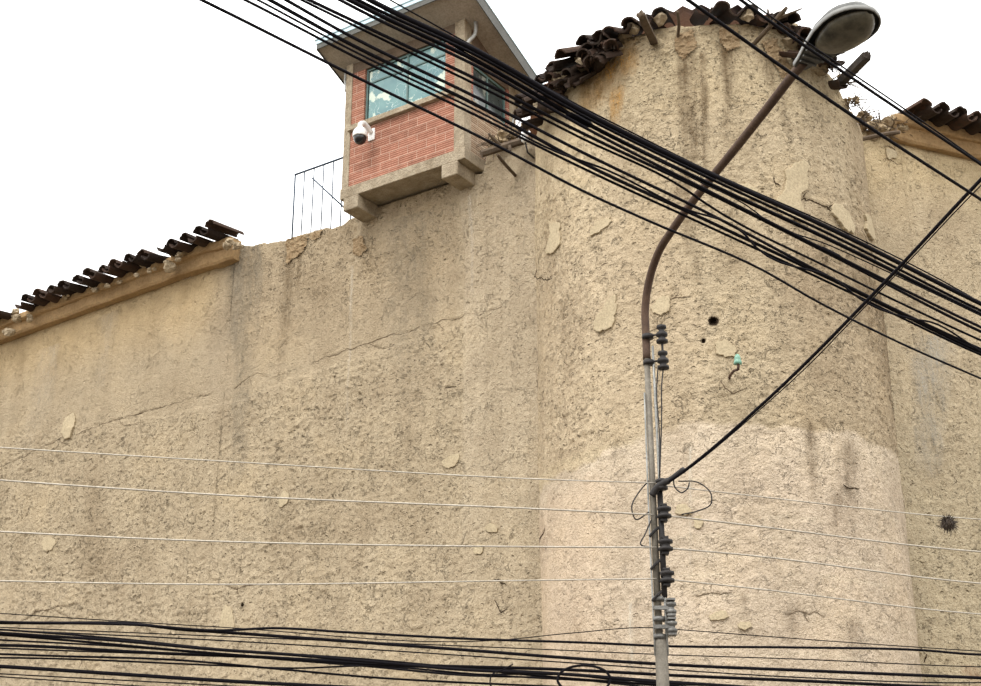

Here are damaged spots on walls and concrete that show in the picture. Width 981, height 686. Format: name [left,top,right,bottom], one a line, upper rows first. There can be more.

peeling [774,160,809,223]
peeling [830,203,876,241]
peeling [61,412,76,440]